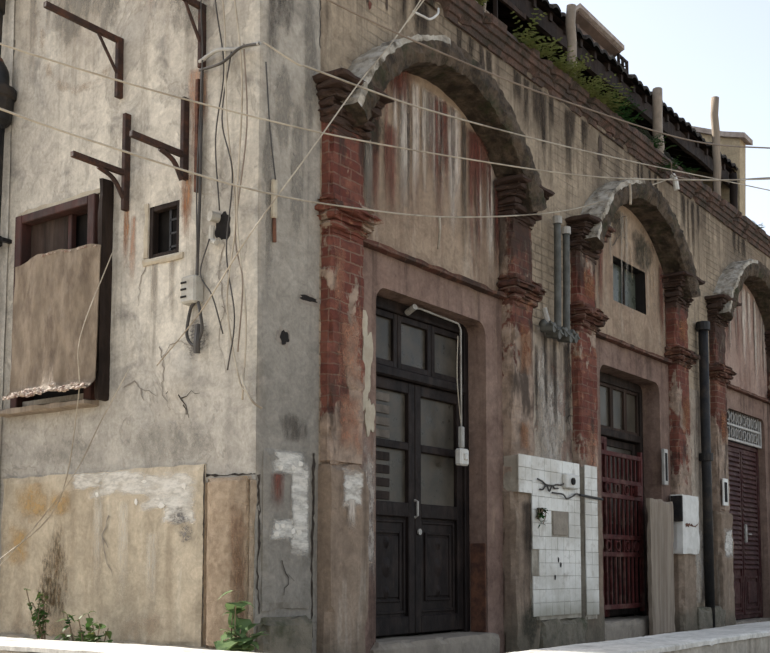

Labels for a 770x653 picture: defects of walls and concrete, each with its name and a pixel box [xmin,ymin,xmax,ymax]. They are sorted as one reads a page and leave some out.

damp [363,86,500,244]
crack [123,341,198,417]
spalling [362,310,375,437]
damp [535,338,569,460]
peeling [74,471,195,523]
peeling [273,452,308,550]